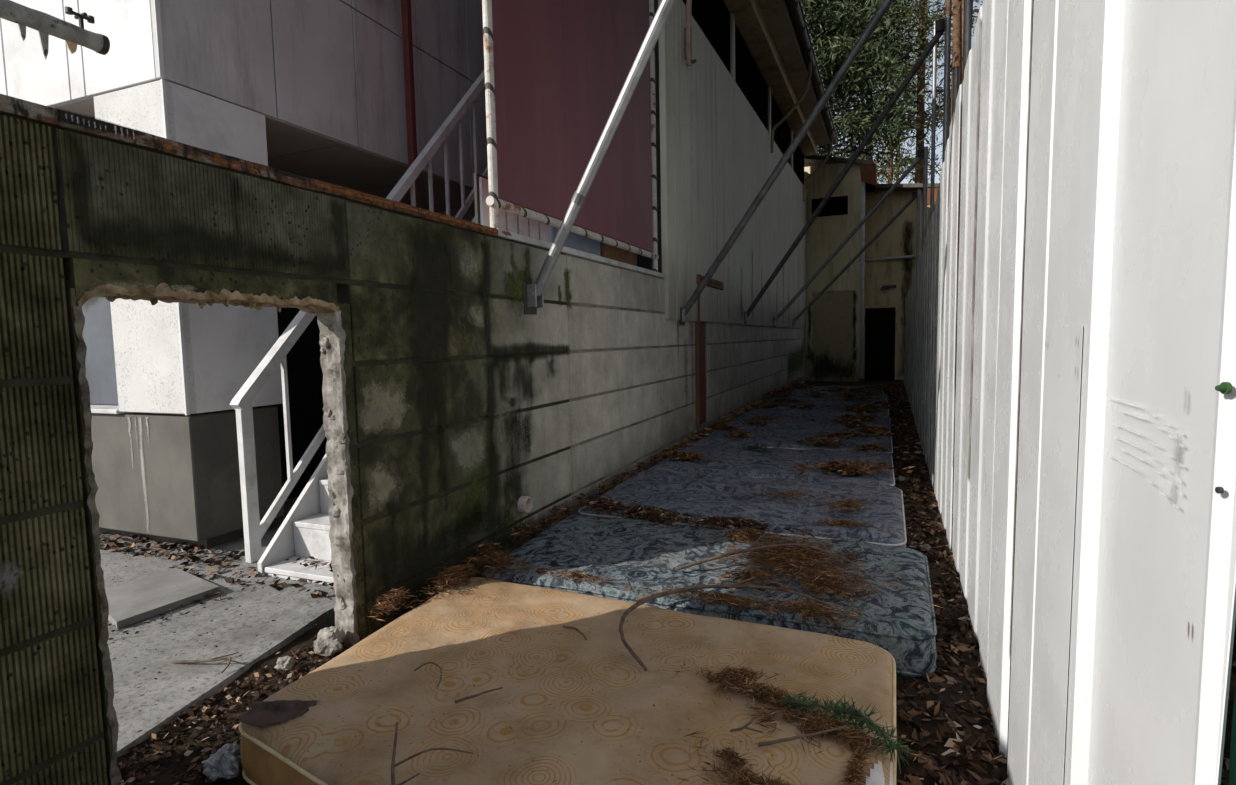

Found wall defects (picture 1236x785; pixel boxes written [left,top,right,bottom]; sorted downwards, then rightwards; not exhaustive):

corrosion [312,182,511,236]
damp [128,417,148,517]
spalling [73,282,407,785]
damp [381,229,572,625]